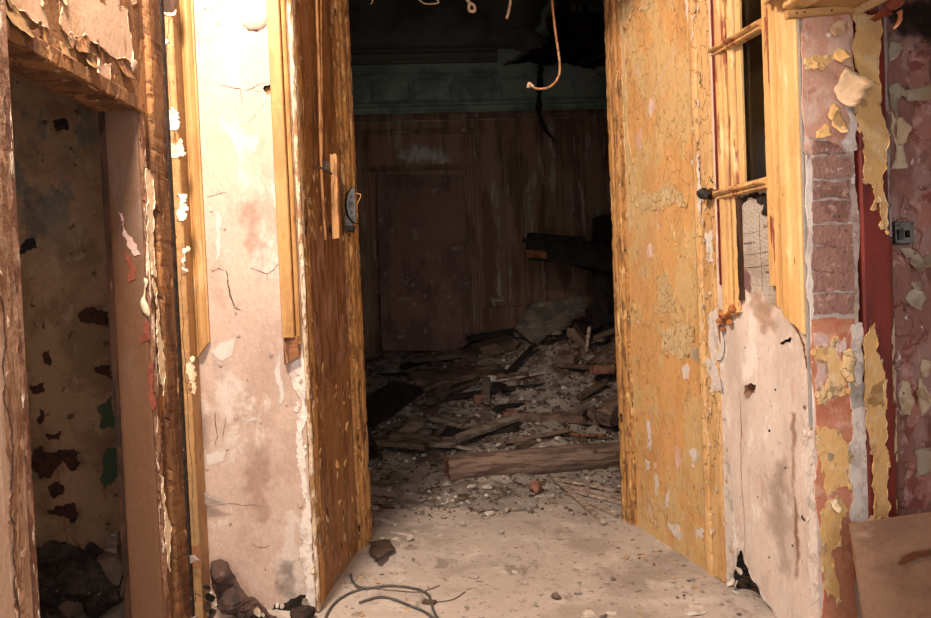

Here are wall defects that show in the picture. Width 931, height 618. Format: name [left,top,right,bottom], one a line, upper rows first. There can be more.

peeling [5,0,138,80]
spalling [53,118,69,132]
peeling [910,99,931,166]
spalling [0,48,38,618]
spalling [97,396,115,429]
peeling [900,334,921,441]
spalling [99,447,118,489]
peeling [903,456,931,511]